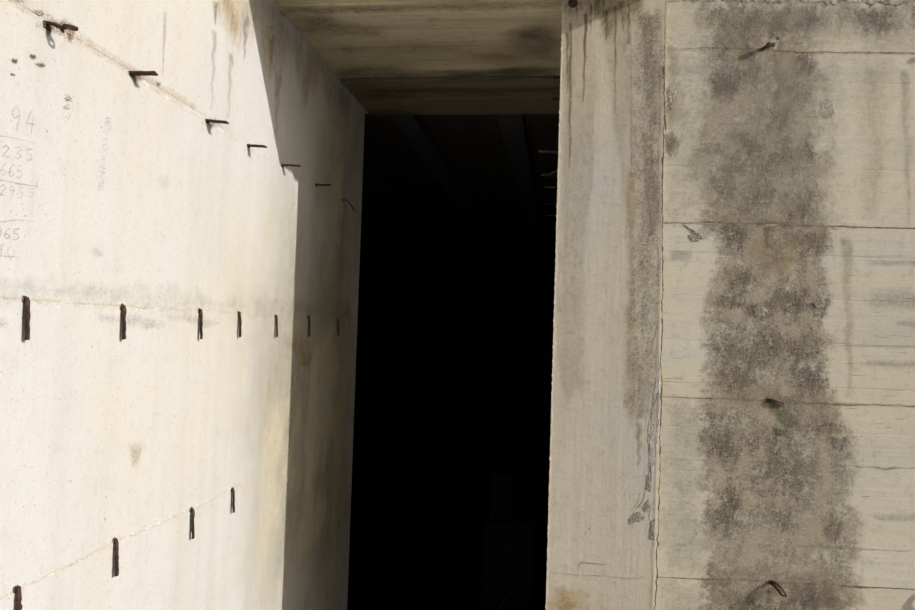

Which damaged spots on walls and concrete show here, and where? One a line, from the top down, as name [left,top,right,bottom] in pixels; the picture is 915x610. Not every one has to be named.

water stain [576,0,679,417]
crack [559,2,915,610]
water stain [693,0,915,610]